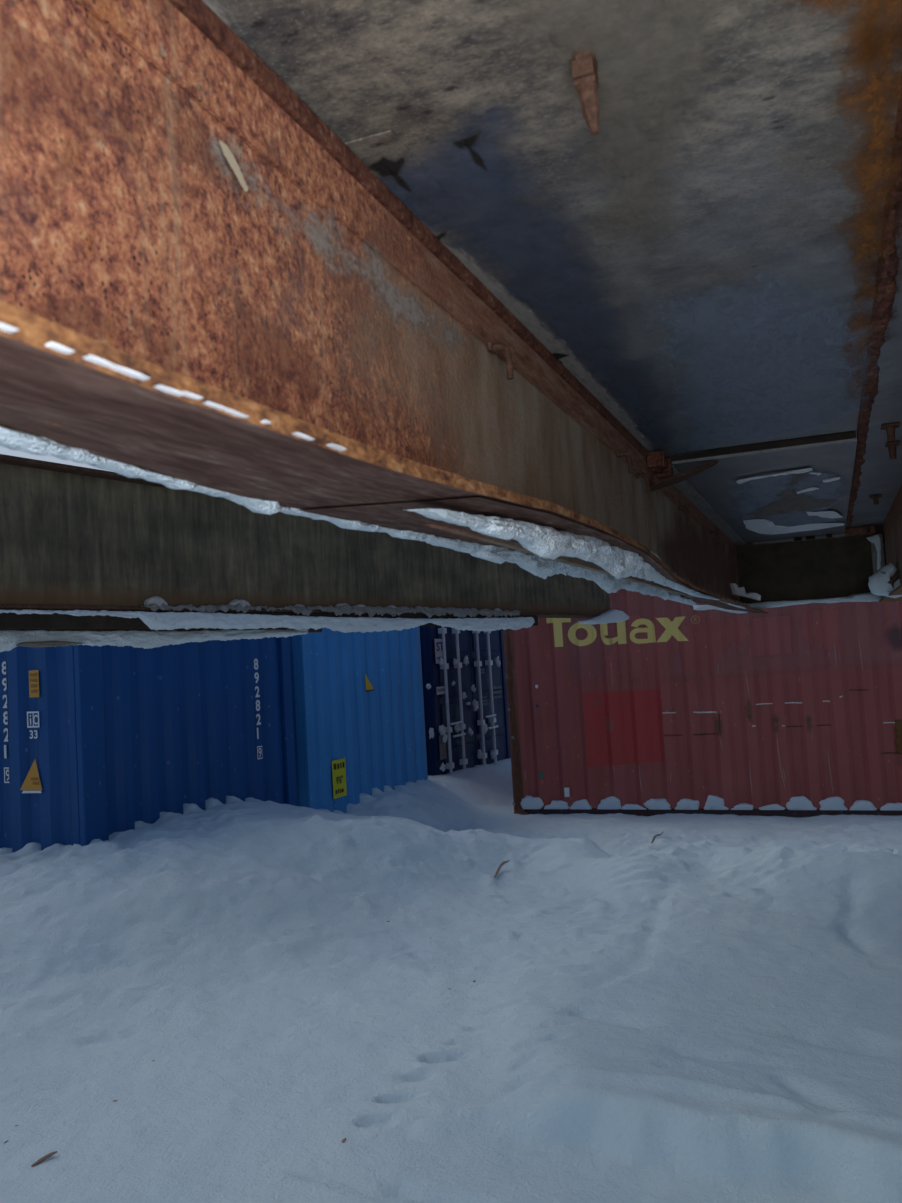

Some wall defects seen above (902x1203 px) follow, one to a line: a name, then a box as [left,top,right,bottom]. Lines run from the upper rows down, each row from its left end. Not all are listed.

peeling [733,468,846,535]